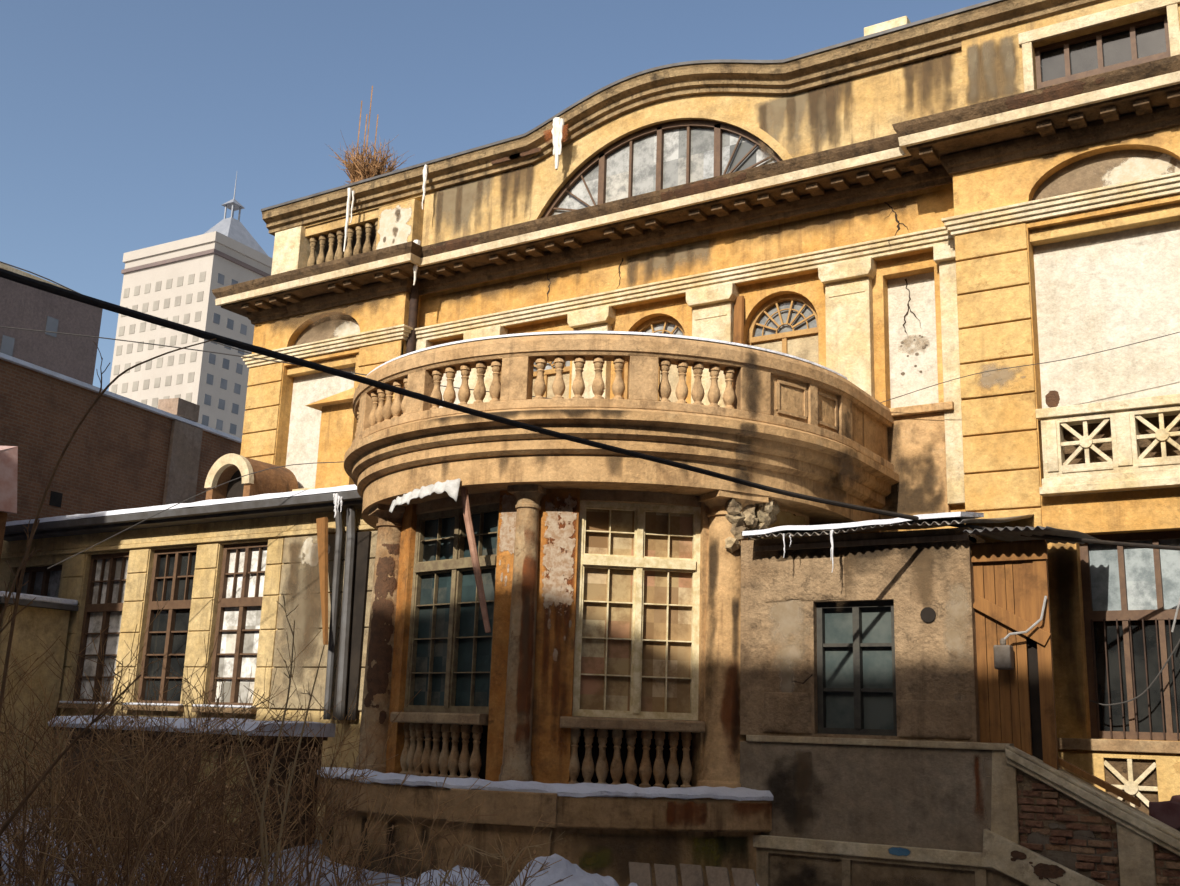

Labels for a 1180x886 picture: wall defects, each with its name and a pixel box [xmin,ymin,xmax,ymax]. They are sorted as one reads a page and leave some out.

leakage [903,52,952,104]
leakage [968,37,1019,104]
leakage [759,79,851,152]
leakage [423,164,533,230]
peeling [1101,153,1180,187]
crack [903,279,920,335]
peeling [542,493,577,661]
rust [516,501,576,743]
leakage [768,753,814,825]
flaking render [1011,850,1066,880]